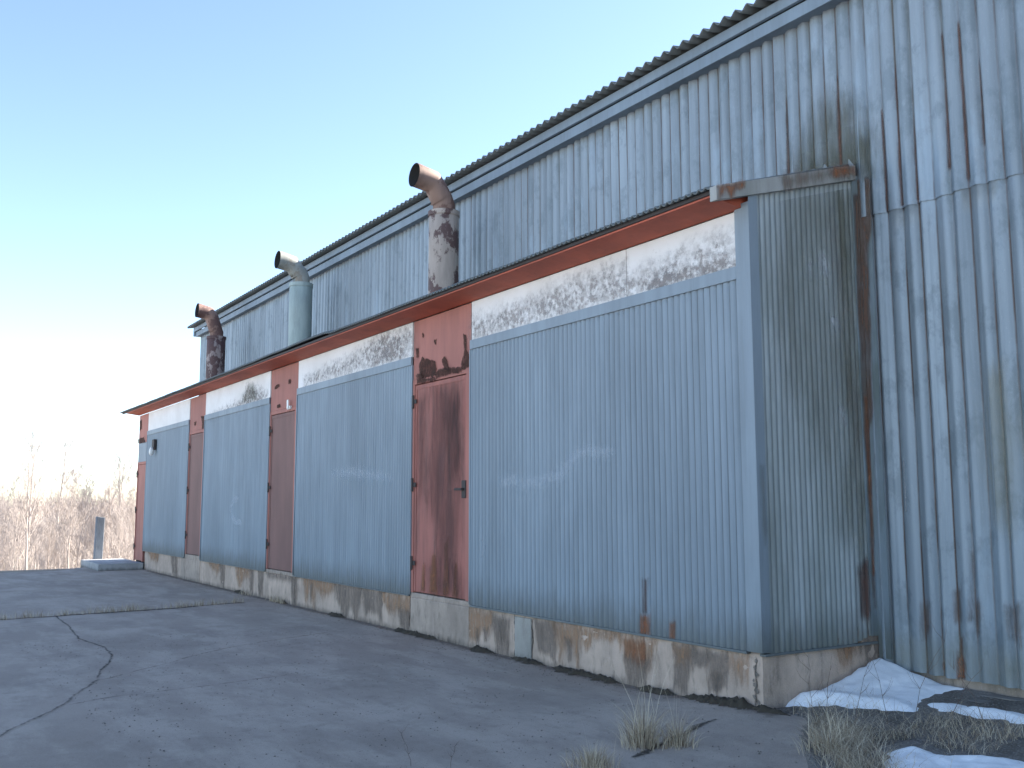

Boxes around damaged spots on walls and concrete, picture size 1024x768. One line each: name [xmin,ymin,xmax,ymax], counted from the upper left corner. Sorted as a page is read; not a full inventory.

rust [720,182,744,197]
damp [473,244,732,336]
damp [304,329,410,381]
rust [783,102,874,620]
damp [149,552,269,600]
damp [268,573,329,614]
damp [336,584,403,633]
crack [0,602,241,735]
damp [429,618,555,669]
damp [608,646,727,698]